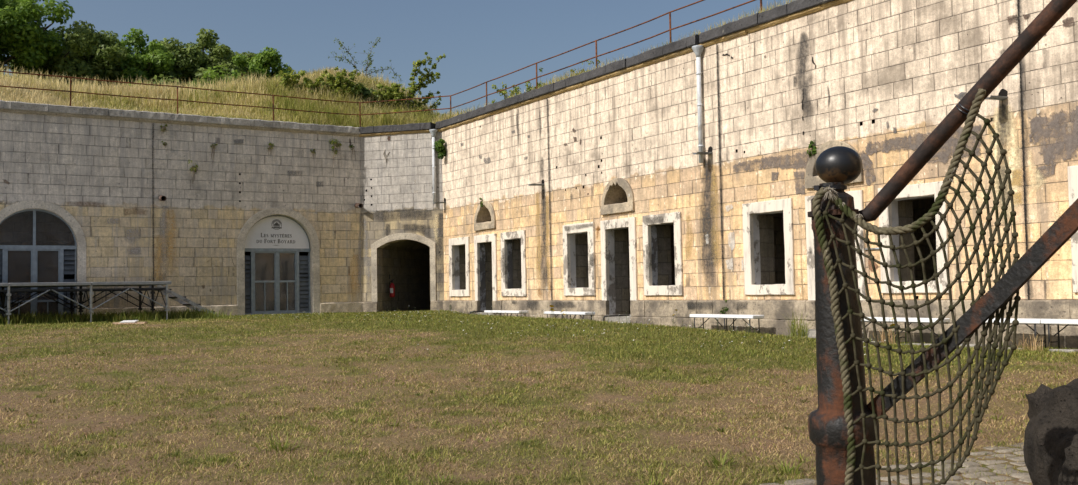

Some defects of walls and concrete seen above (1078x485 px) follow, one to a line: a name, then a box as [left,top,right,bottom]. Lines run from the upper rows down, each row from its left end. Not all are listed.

water stain [794,34,811,112]
water stain [991,106,1042,218]